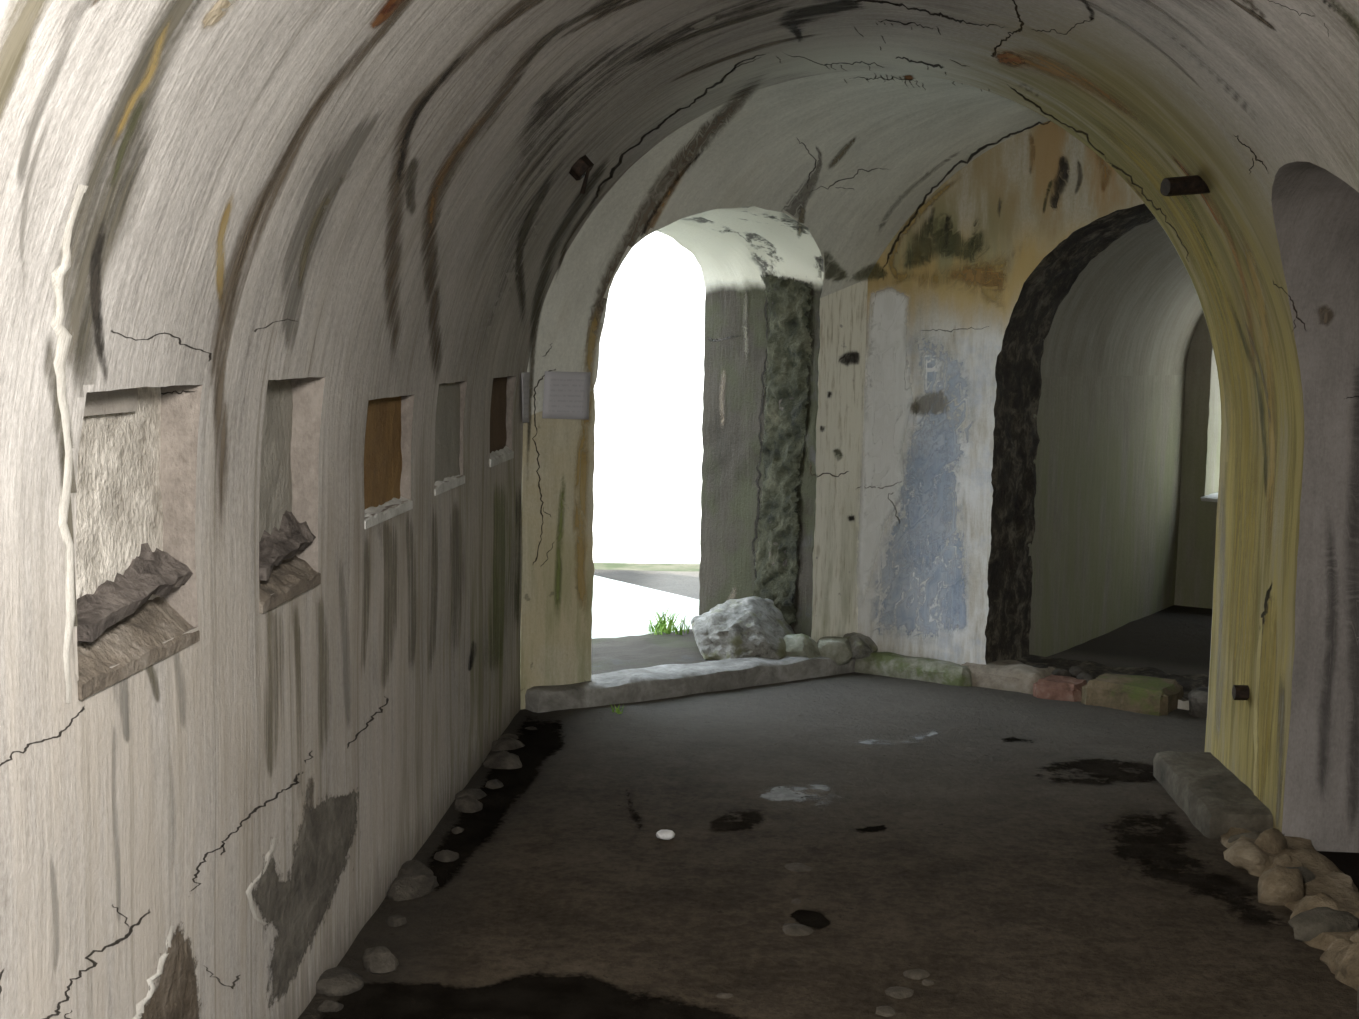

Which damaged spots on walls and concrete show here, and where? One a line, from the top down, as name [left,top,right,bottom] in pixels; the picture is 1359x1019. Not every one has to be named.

rust [371,0,403,28]
rust [996,52,1129,113]
crack [593,0,1189,271]
peeling [858,289,943,599]
crack [0,707,85,766]
crack [347,698,389,748]
crack [191,751,313,891]
flaking render [246,783,359,1006]
crack [43,905,150,1019]
flaking render [132,923,200,1019]
crack [206,967,240,989]